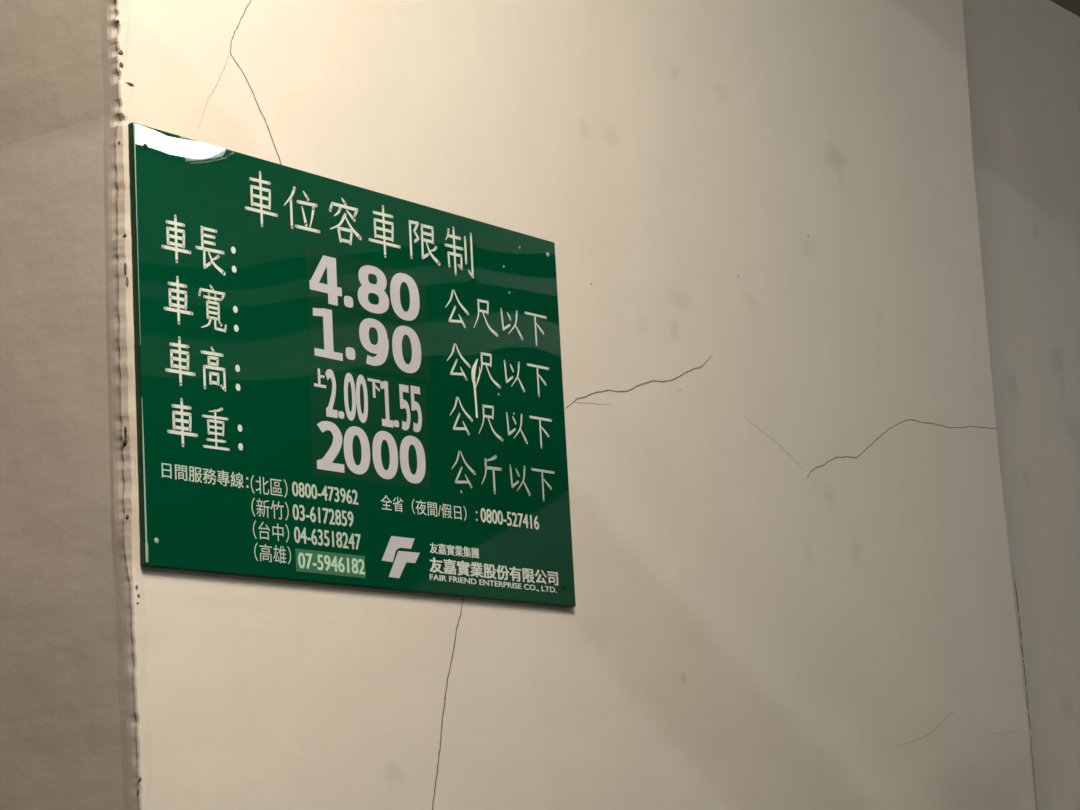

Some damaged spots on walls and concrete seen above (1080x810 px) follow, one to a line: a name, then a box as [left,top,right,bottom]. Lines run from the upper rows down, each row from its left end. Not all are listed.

crack [198,0,282,165]
crack [565,355,712,409]
crack [750,419,1009,537]
crack [432,597,464,810]
crack [996,570,1037,810]